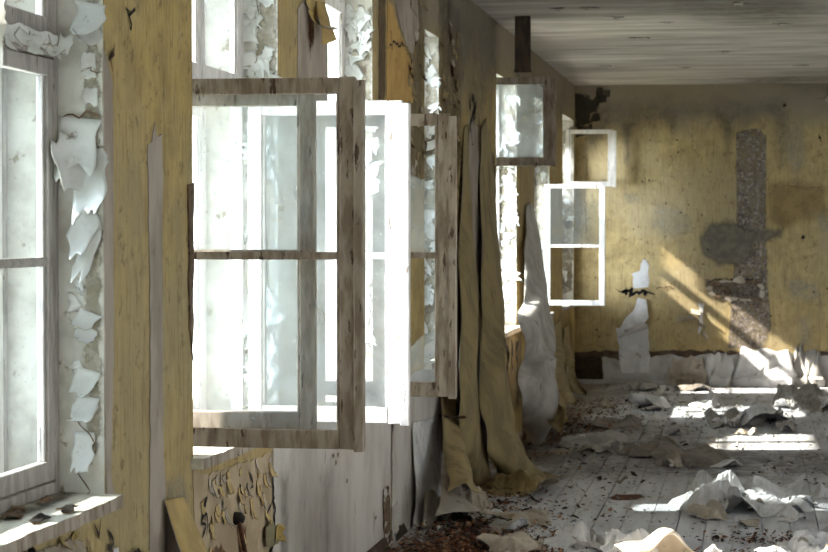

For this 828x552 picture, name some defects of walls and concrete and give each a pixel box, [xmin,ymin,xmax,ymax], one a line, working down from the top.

peeling [243,0,282,78]
flaking render [297,0,334,78]
peeling [344,3,375,100]
peeling [365,126,384,247]
flaking render [736,129,766,232]
peeling [2,0,115,494]
peeling [365,259,378,362]
crack [616,285,673,297]
flaking render [677,241,771,369]
water stain [700,222,781,265]
flaking render [602,354,684,380]
flaking render [192,396,443,552]